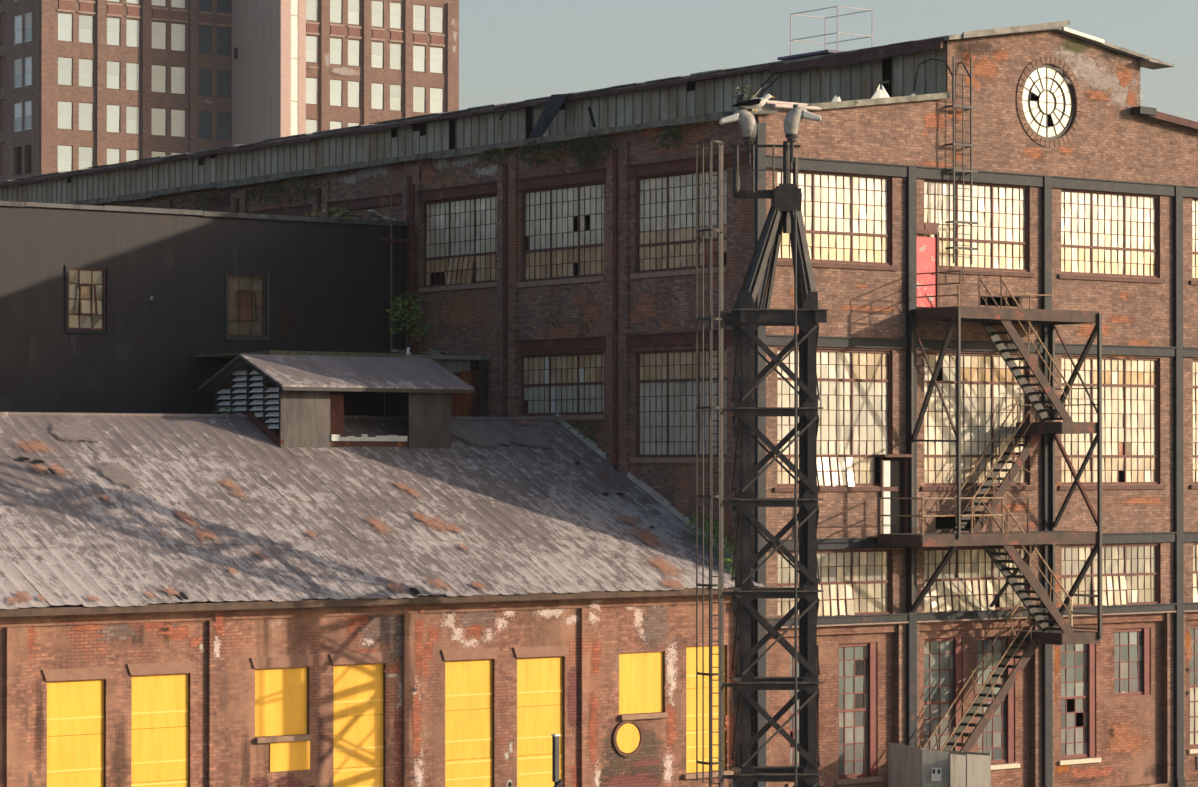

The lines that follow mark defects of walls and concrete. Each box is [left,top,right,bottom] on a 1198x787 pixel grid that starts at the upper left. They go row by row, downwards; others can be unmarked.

spalling [1086,66,1138,107]
corrosion [448,370,477,417]